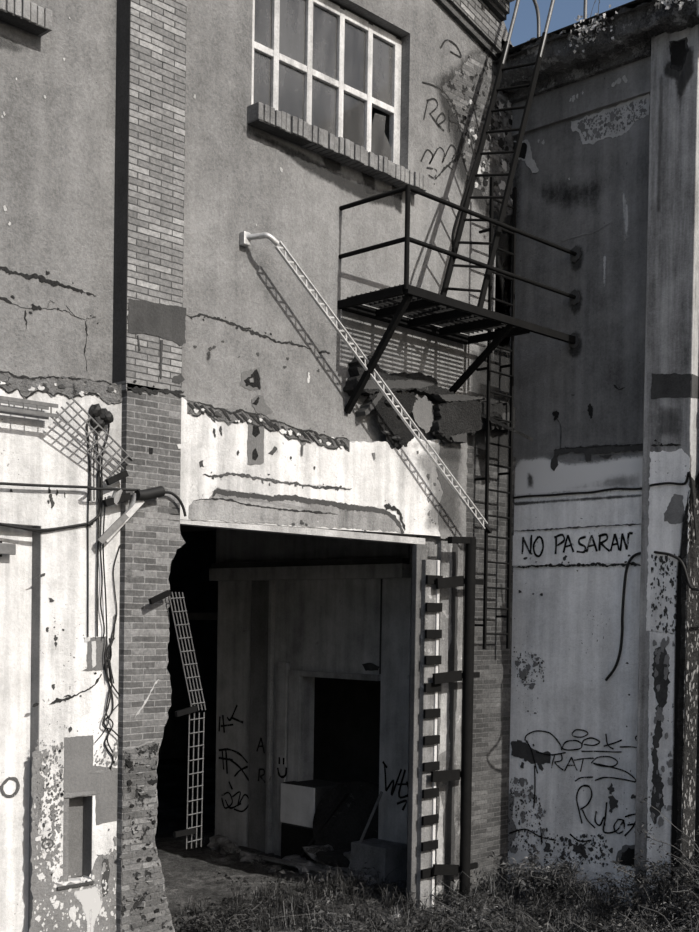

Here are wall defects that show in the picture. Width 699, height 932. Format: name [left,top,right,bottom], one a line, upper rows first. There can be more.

spalling [441,50,539,218]
peeling [571,94,650,145]
crack [0,266,99,370]
crack [187,313,330,354]
spalling [0,369,122,404]
spalling [187,368,350,452]
flaking render [343,355,516,539]
peeling [508,443,690,890]
spalling [28,740,174,932]